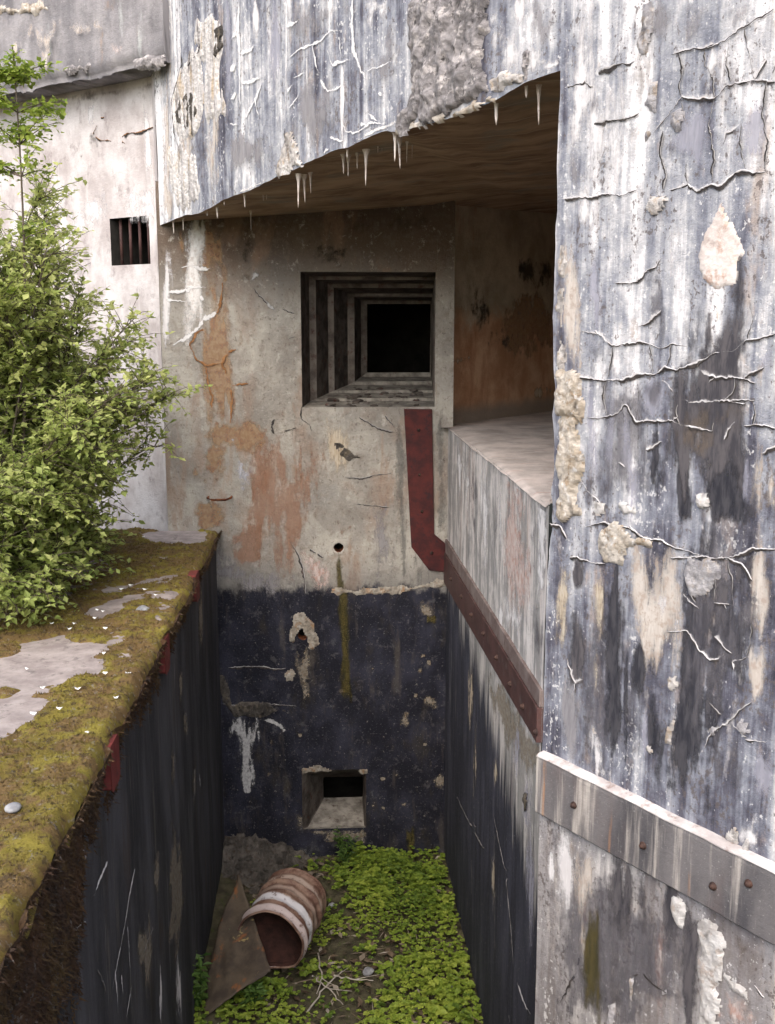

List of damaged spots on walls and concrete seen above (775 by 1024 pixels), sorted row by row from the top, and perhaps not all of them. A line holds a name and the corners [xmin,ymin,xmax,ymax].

leakage [292,58,344,142]
crack [284,0,391,153]
spalling [395,0,530,137]
crack [594,9,775,193]
peeling [698,203,745,289]
rust [194,230,313,565]
crack [579,301,775,455]
spalling [289,612,320,650]
crack [550,481,775,669]
leakage [562,533,769,789]
leakage [739,821,757,845]
peeling [670,896,752,1024]